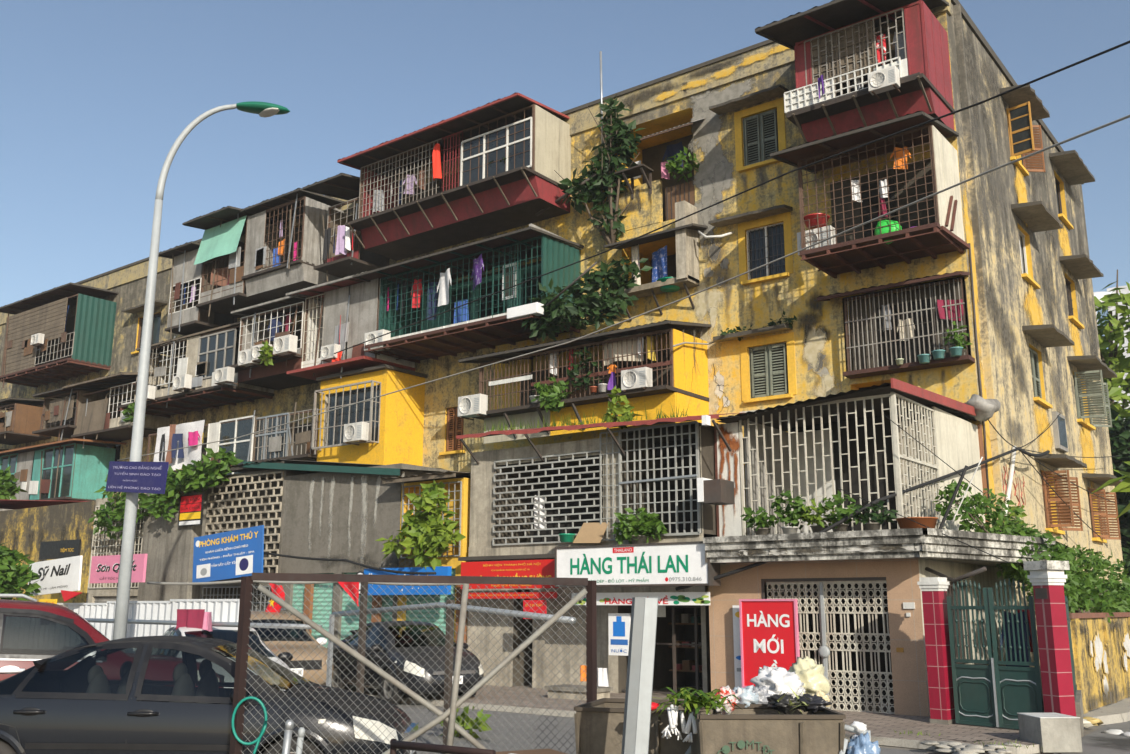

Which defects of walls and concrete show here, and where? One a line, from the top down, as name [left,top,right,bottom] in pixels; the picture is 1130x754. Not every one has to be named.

water stain [964,34,1008,246]
peeling [655,45,790,420]
water stain [1044,268,1056,325]
peeling [803,325,840,397]
water stain [985,280,1027,391]
water stain [309,476,340,565]
water stain [348,475,381,548]
rust [718,424,740,536]
water stain [387,554,415,568]
peeling [1089,630,1109,695]
peeling [1122,632,1130,672]